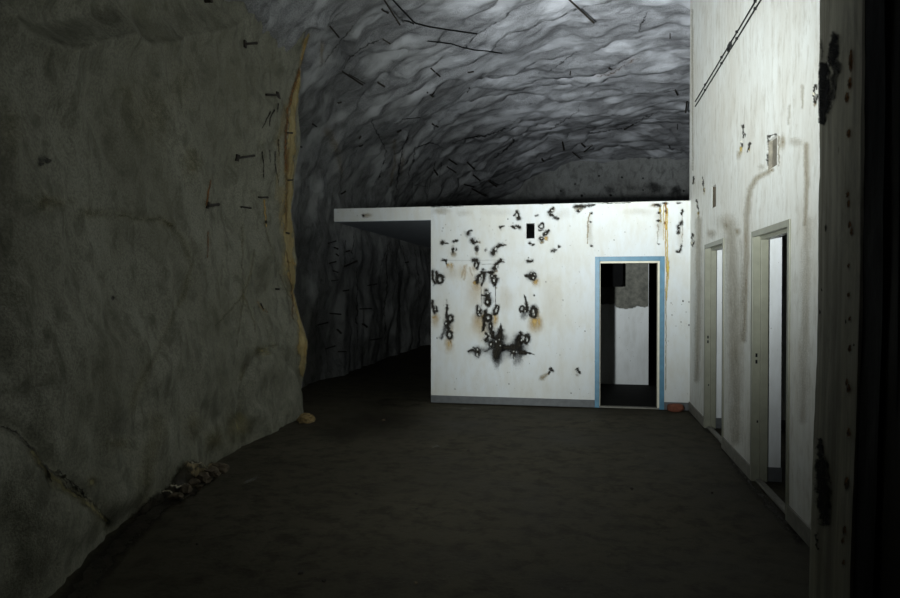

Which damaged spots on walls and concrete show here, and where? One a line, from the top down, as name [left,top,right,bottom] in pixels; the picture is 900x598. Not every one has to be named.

crack [3,426,110,525]